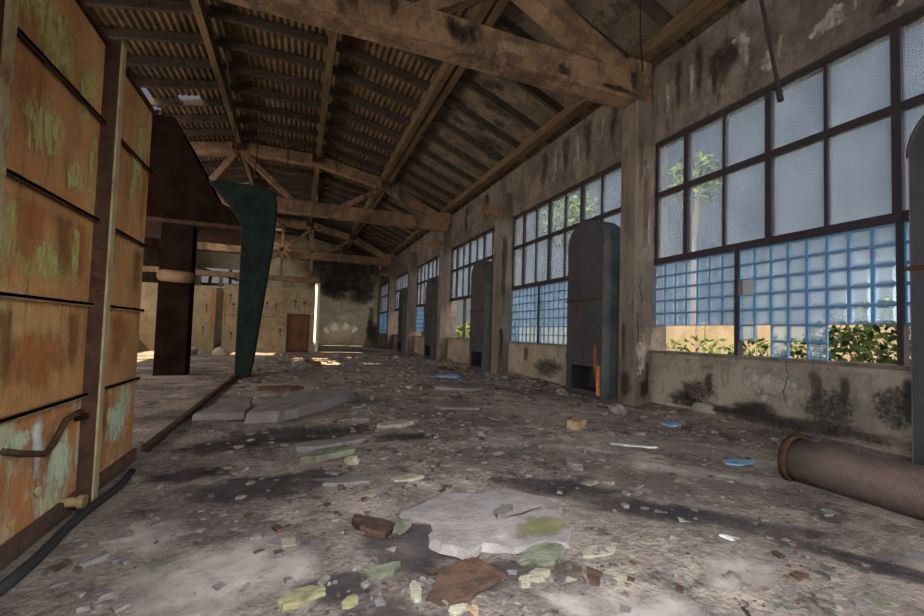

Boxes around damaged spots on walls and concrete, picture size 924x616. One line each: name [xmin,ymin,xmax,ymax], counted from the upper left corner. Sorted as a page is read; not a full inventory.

flaking render [808,2,843,39]
water stain [666,41,738,114]
water stain [542,108,617,182]
water stain [671,363,912,444]